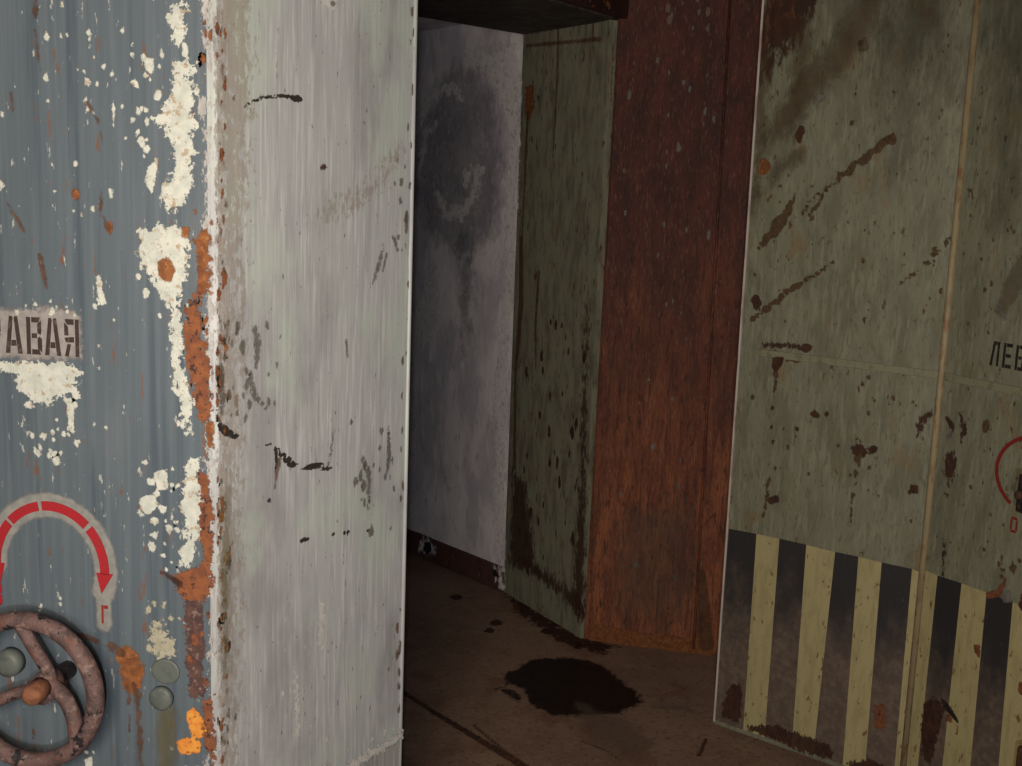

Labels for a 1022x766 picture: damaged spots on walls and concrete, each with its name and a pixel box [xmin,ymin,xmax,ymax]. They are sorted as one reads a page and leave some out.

rust [200,20,235,104]
rust [759,0,816,88]
rust [795,125,814,143]
peeling [124,0,199,436]
rust [757,133,896,250]
peeling [93,275,107,309]
peeling [0,359,84,466]
rust [506,85,715,656]
rust [160,470,237,766]
damp [496,657,642,717]
rust [747,723,833,759]
rust [846,758,883,766]